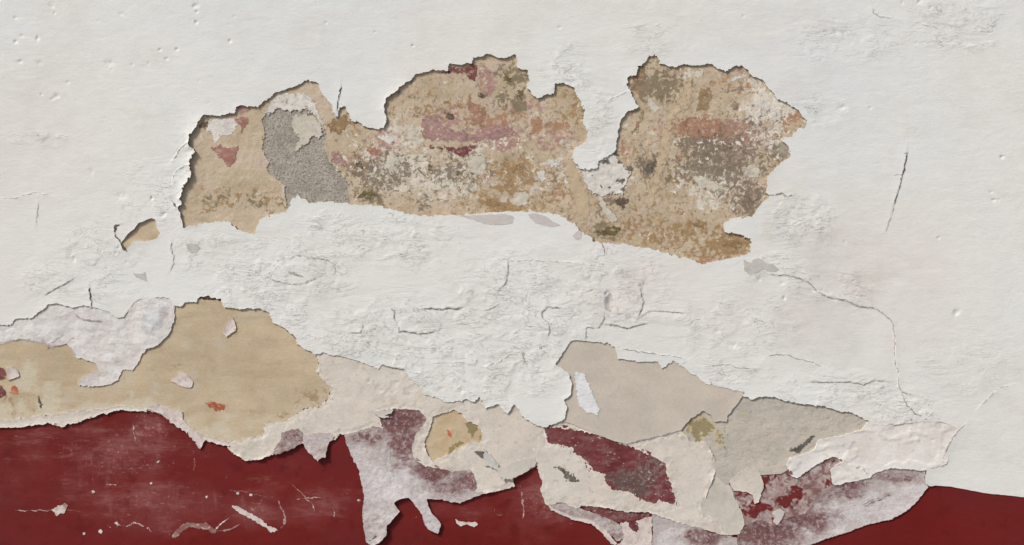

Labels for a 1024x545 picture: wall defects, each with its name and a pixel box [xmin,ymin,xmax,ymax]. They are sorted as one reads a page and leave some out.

spalling [178,54,807,274]
crack [886,152,907,230]
spalling [121,218,160,249]
crack [391,307,459,334]
crack [485,259,568,310]
crack [586,290,700,358]
crack [706,274,929,420]
peeling [0,296,960,545]